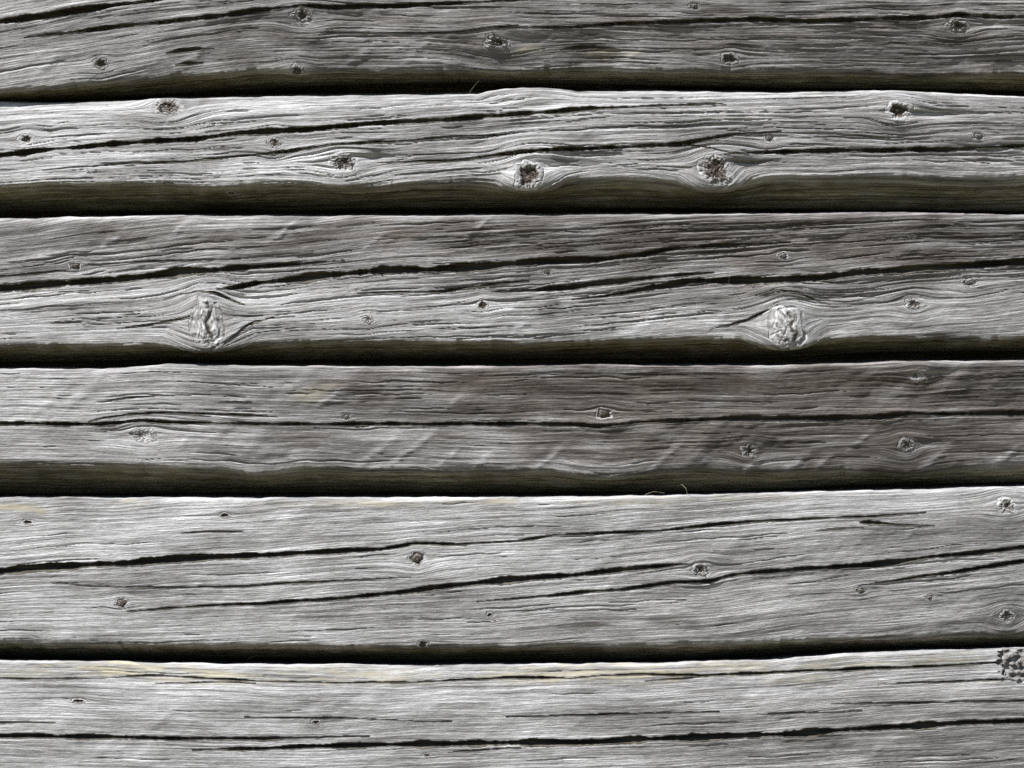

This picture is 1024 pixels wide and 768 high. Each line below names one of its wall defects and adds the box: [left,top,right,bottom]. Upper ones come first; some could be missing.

crack [0,103,1024,170]
crack [0,242,1024,348]
crack [0,512,1024,612]
crack [0,662,1024,752]